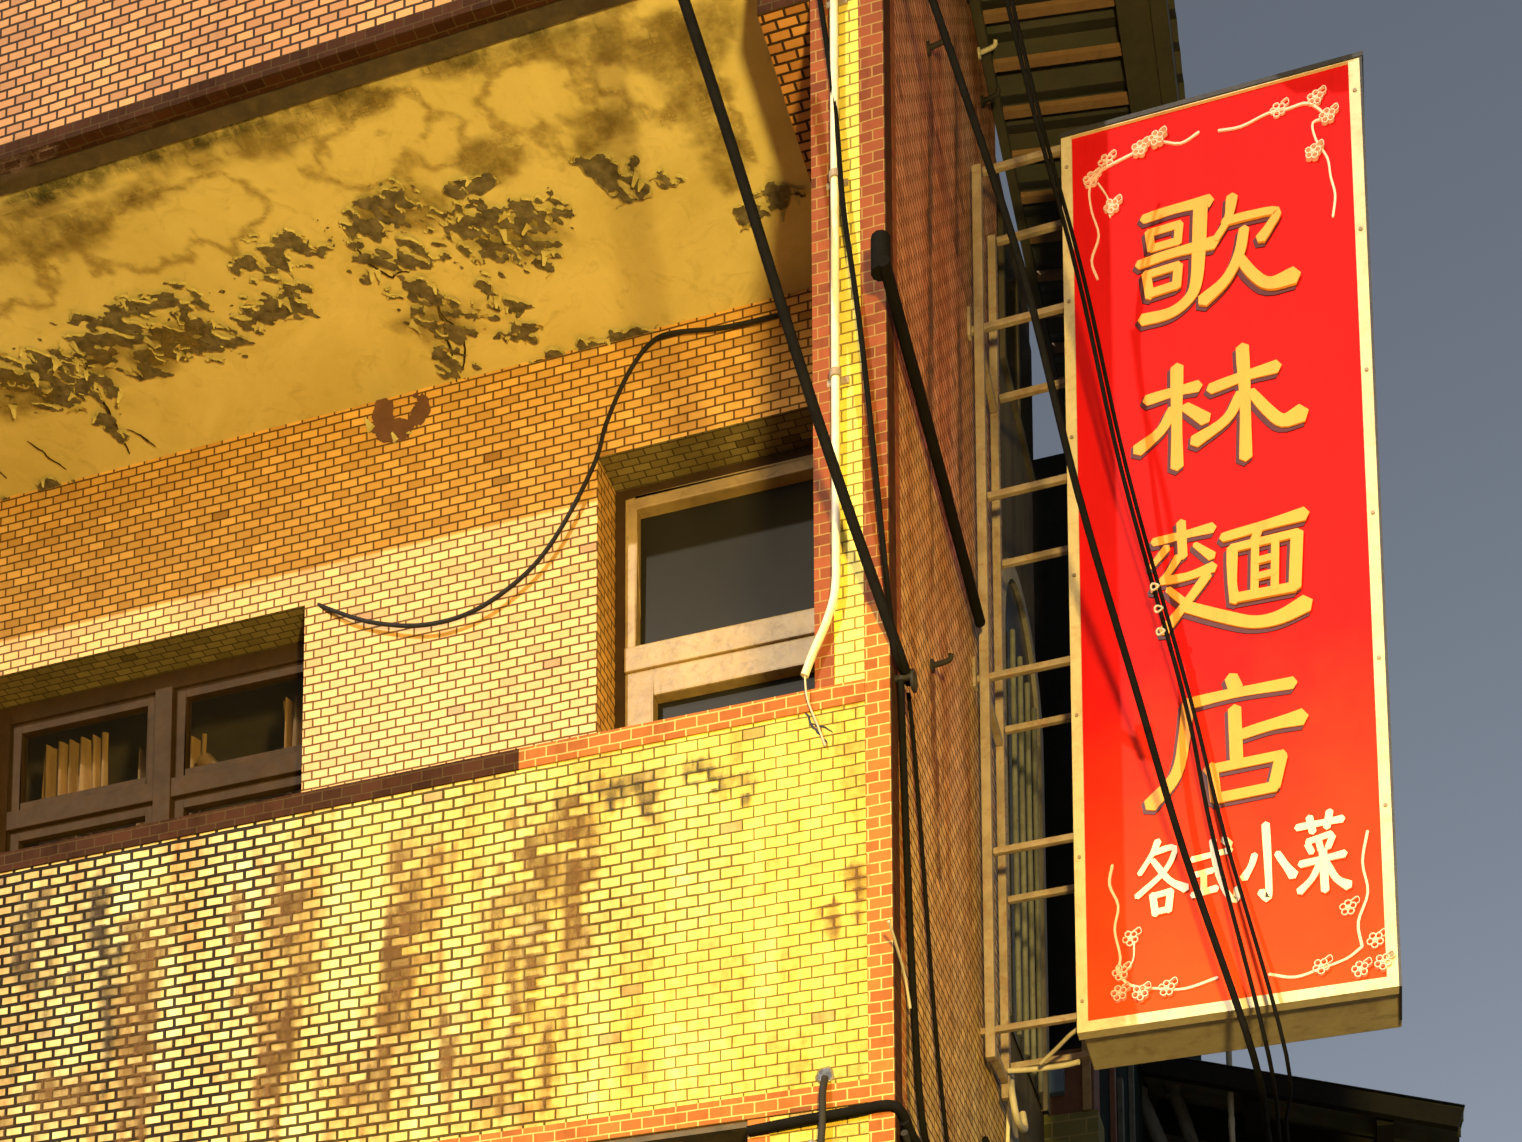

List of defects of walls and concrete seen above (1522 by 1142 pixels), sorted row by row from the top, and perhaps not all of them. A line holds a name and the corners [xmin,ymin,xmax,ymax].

leakage [3,85,390,221]
peeling [568,154,688,208]
peeling [0,172,658,444]
peeling [36,476,76,491]
leakage [685,758,718,791]
leakage [13,886,169,1142]
leakage [227,898,244,966]
leakage [253,867,323,1138]
leakage [319,837,443,1120]
leakage [439,1004,474,1112]
leakage [482,780,623,1117]
leakage [824,868,863,933]